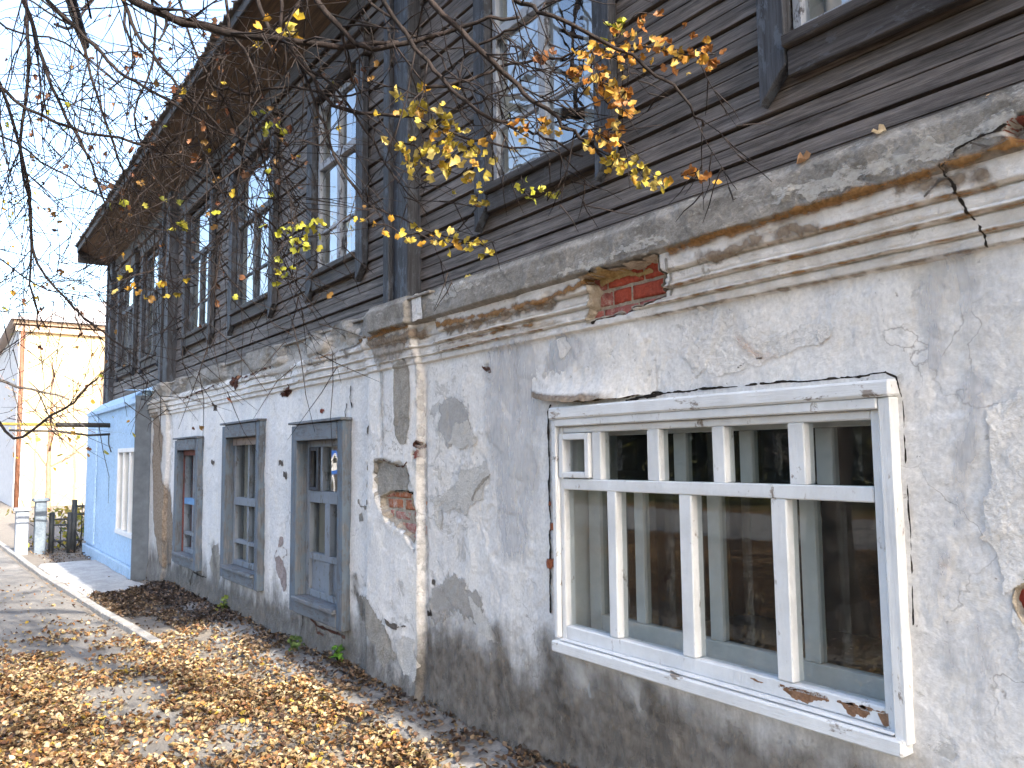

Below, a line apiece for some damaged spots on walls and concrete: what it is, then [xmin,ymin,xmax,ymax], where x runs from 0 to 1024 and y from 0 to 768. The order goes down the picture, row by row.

crack [924,123,1008,248]
flaking render [549,234,673,324]
flaking render [357,358,490,553]
crack [625,371,914,625]
flaking render [980,384,1024,663]
flaking render [426,574,501,647]
water stain [427,627,827,768]
peeling [780,684,889,727]